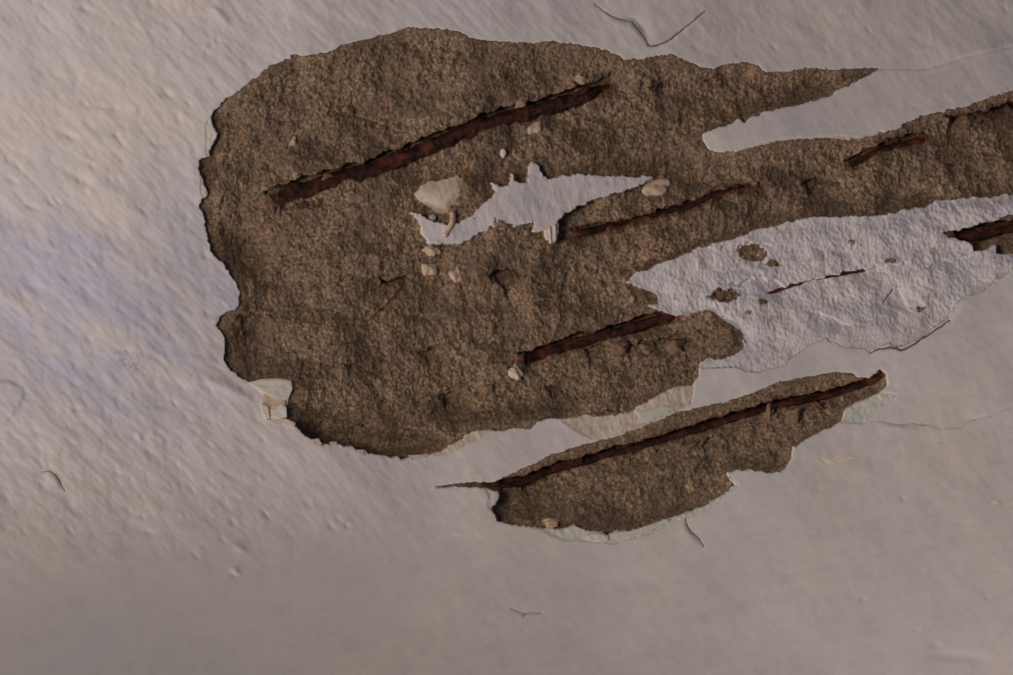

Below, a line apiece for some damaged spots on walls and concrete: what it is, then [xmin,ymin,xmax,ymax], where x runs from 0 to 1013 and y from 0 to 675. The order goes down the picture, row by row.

crack [594,3,705,47]
spalling [198,27,1013,544]